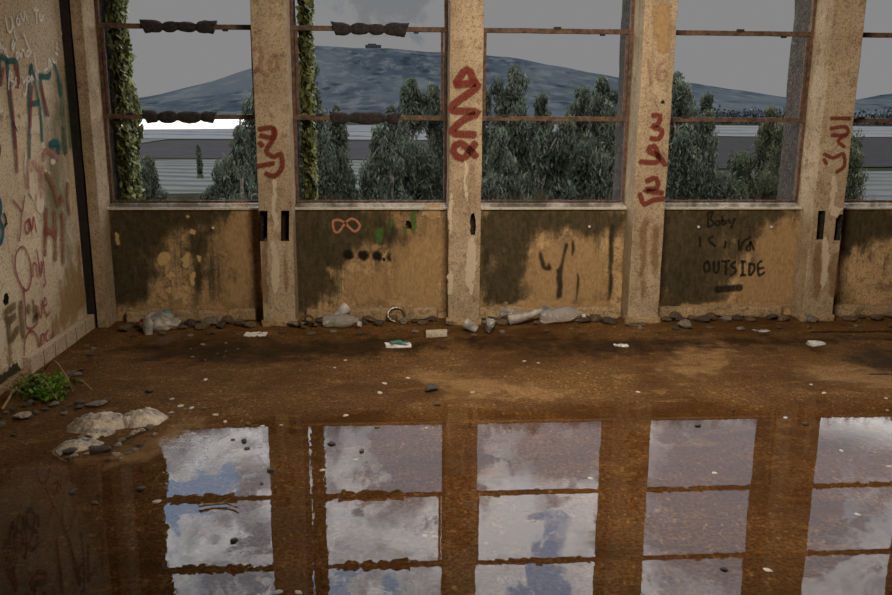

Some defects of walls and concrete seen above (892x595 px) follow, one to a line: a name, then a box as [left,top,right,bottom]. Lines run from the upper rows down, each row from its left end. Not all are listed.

water stain [109,198,260,308]
water stain [480,193,626,306]